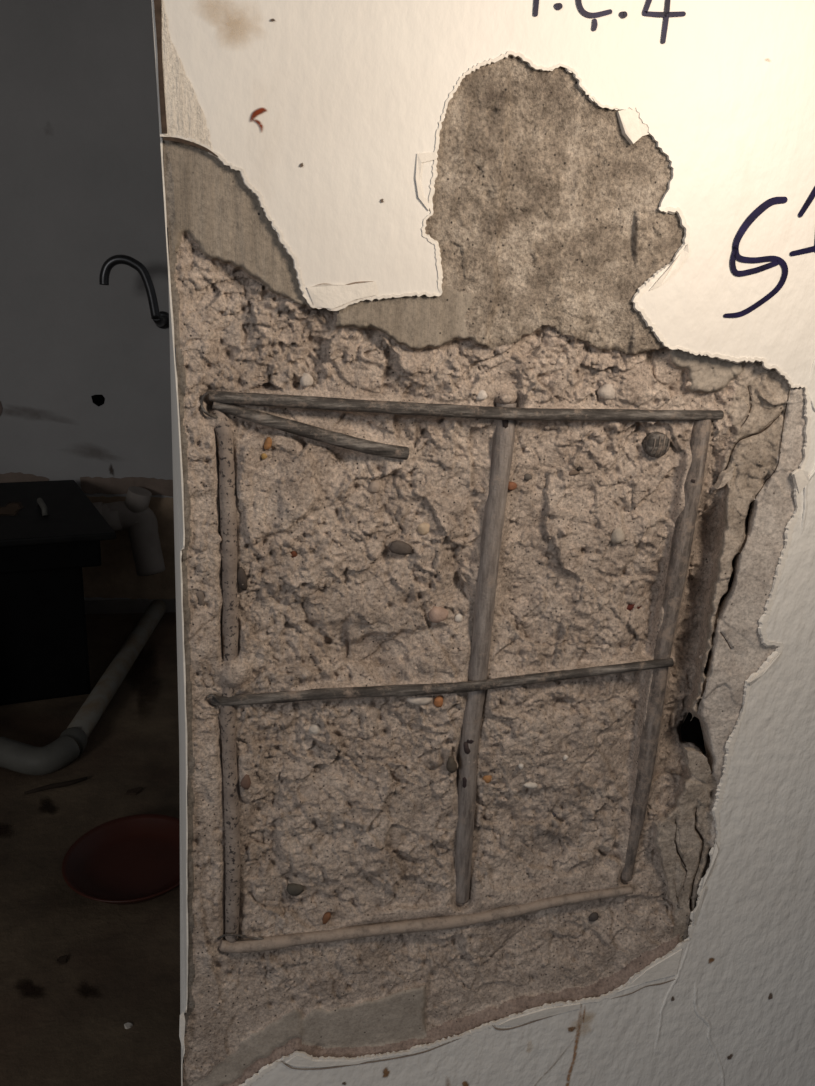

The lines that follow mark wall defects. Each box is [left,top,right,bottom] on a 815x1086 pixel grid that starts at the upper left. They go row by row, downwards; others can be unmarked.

flaking render [80,477,176,599]
spalling [160,0,811,1086]
crack [697,388,815,710]
crack [492,1007,585,1086]
crack [612,939,690,1053]